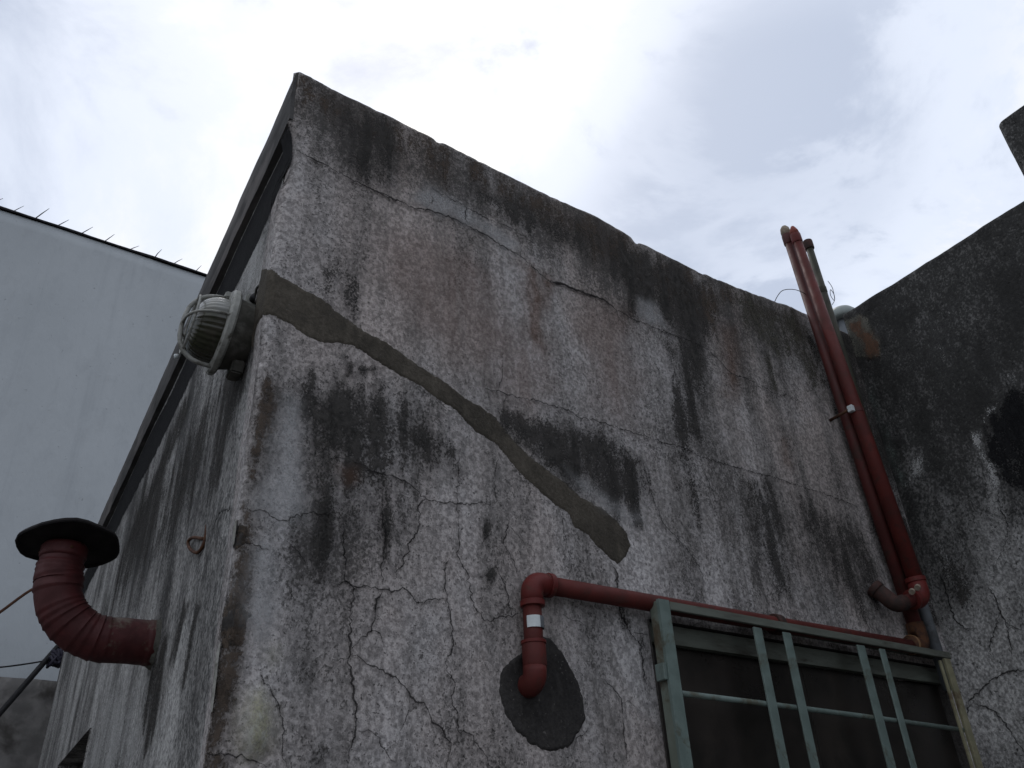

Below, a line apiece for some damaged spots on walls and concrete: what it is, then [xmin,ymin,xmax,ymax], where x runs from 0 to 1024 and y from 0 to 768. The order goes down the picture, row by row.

damp [217,127,292,296]
crack [269,153,801,402]
damp [291,73,845,531]
damp [101,340,254,615]
damp [985,389,1024,492]
damp [83,566,98,594]
damp [142,595,200,759]
crack [205,456,525,768]
crack [563,562,646,682]
crack [606,681,631,766]